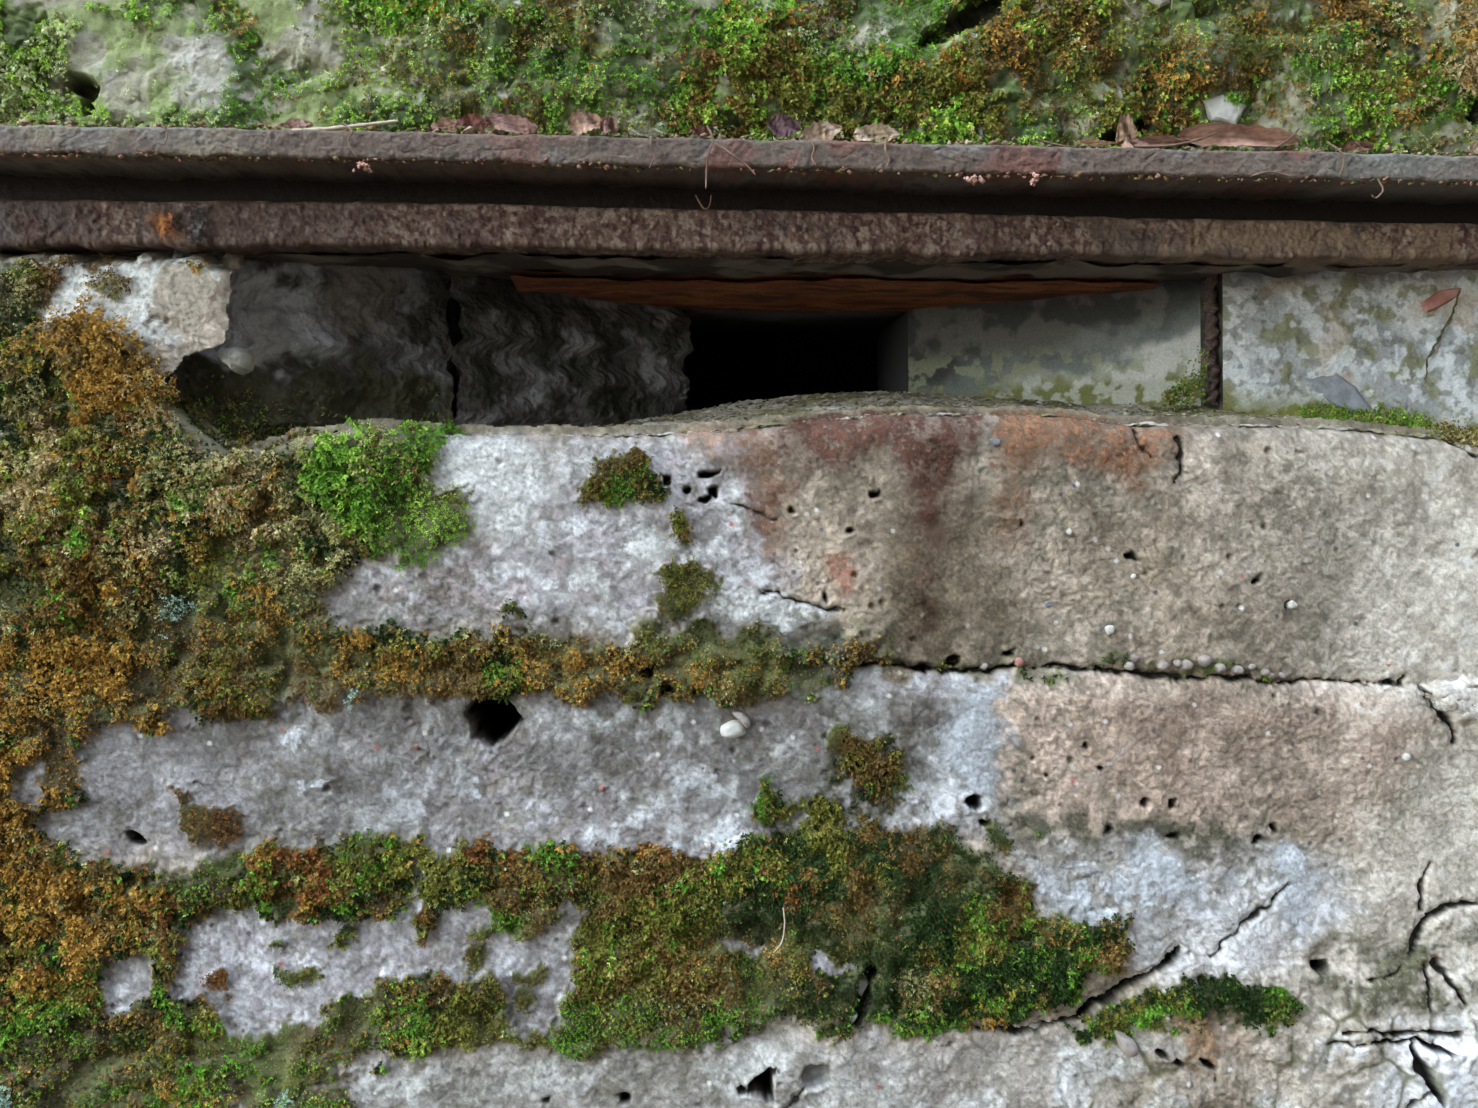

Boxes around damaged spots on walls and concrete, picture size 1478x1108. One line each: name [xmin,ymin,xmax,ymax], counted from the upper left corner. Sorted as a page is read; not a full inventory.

rust [150,205,204,244]
rust [1203,274,1221,406]
rust [680,409,1175,549]
rust [827,555,856,593]
crack [860,661,1454,743]
crack [1330,864,1478,1103]